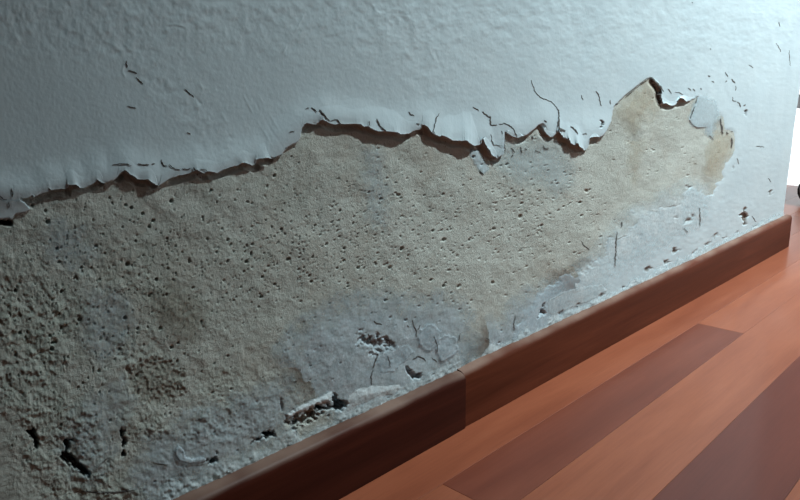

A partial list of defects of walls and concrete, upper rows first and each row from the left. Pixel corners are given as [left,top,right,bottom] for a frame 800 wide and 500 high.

crack [531,80,587,134]
peeling [0,78,735,500]
efflorescence [283,298,472,417]
damp [487,284,569,351]
efflorescence [566,186,703,295]
flaking render [624,209,783,291]